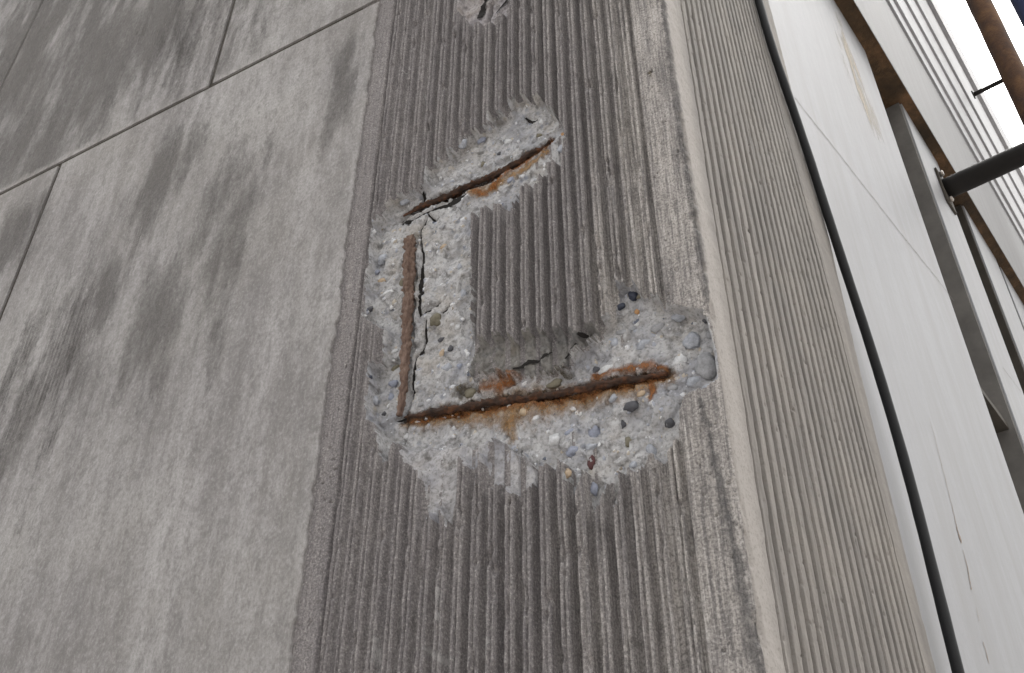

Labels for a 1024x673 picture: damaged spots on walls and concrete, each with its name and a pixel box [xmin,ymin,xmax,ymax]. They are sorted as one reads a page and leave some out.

spalling [457,0,511,28]
corrosion [403,138,554,217]
crack [397,214,450,445]
corrosion [396,234,675,440]
spalling [361,91,719,527]
crack [513,332,589,369]